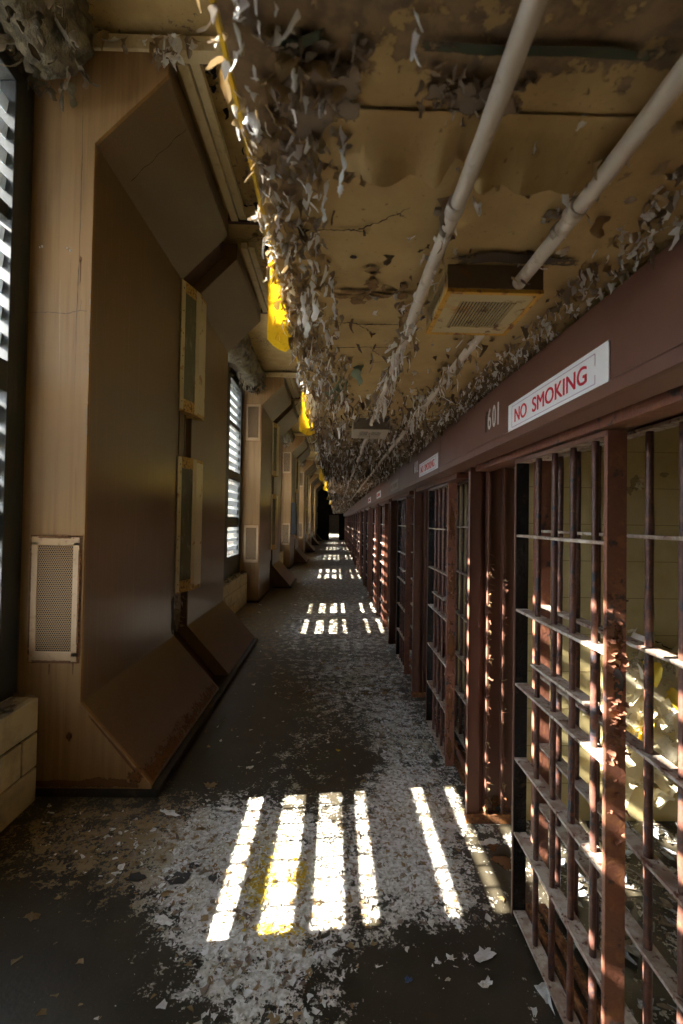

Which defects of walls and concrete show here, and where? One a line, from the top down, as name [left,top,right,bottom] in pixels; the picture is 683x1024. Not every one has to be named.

crack [306,208,409,233]
peeling [142,0,683,514]